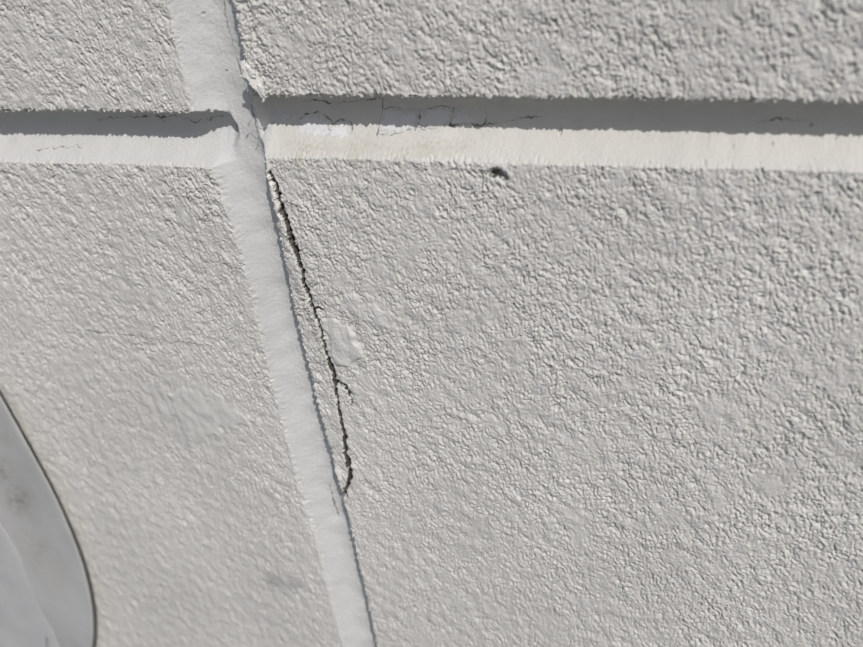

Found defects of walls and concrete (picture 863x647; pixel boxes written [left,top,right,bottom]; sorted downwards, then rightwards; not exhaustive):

peeling [240,60,267,103]
crack [269,171,354,516]